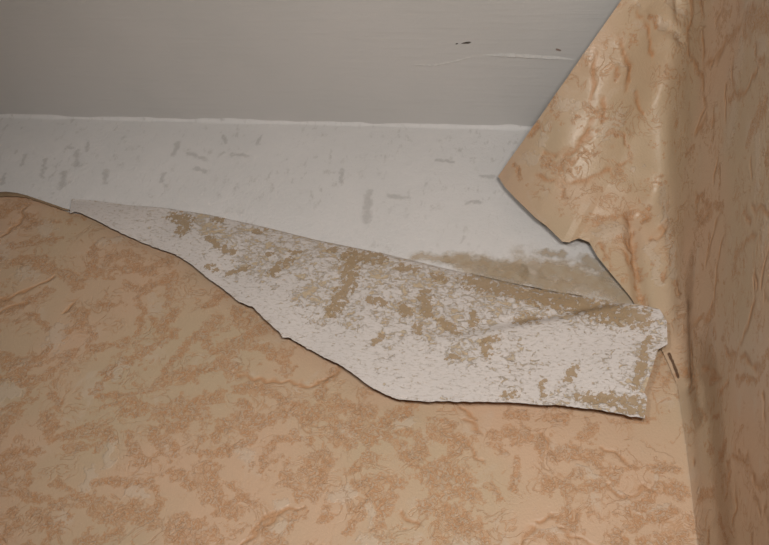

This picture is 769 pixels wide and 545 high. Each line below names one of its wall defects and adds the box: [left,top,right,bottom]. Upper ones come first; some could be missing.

peeling [165,211,196,238]
peeling [205,235,237,255]
peeling [204,263,251,277]
peeling [265,250,303,277]
peeling [324,246,655,407]